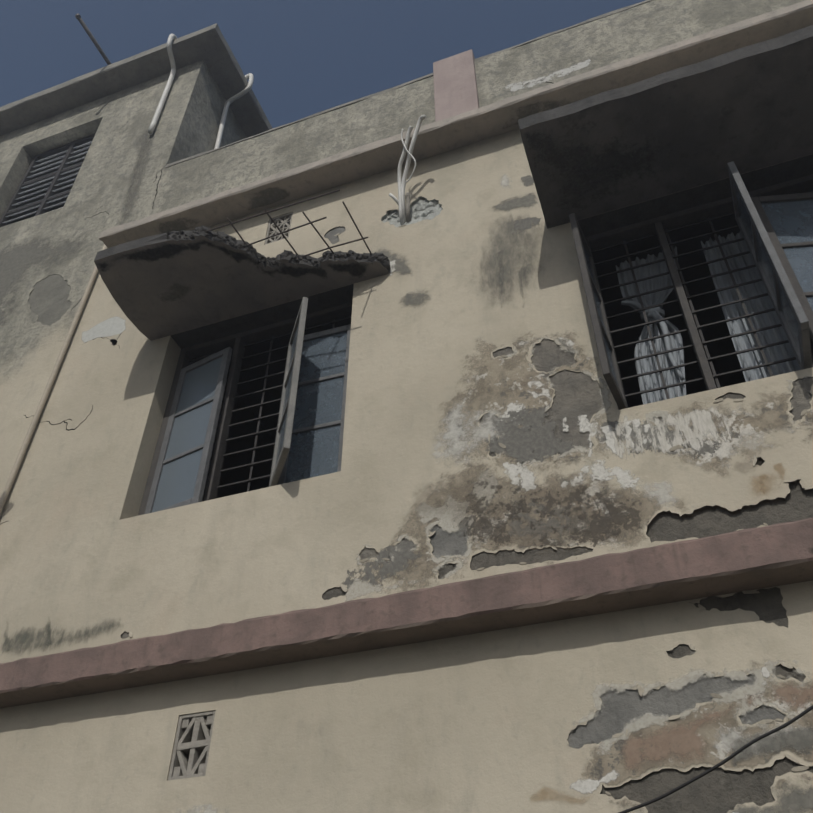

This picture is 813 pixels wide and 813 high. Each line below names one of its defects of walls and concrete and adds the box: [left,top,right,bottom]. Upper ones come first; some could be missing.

spalling [166,189,389,267]
spalling [381,196,443,227]
water stain [483,175,541,294]
water stain [0,239,81,323]
peeling [28,274,72,326]
crack [25,405,93,431]
peeling [322,333,813,600]
peeling [689,587,788,628]
mould [3,622,114,651]
peeling [666,644,696,658]
peeling [567,661,813,813]